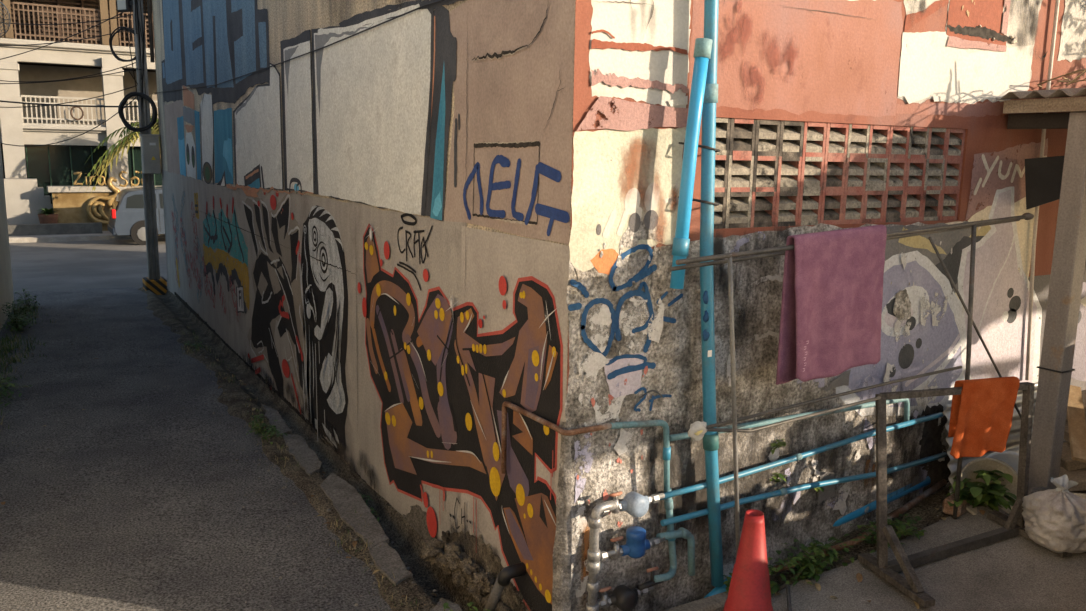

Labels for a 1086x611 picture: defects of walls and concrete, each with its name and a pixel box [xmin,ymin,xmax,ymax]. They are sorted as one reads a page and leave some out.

crack [596,0,654,26]
spalling [947,0,1018,44]
crack [465,6,548,269]
rust [626,142,648,201]
rust [657,195,676,242]